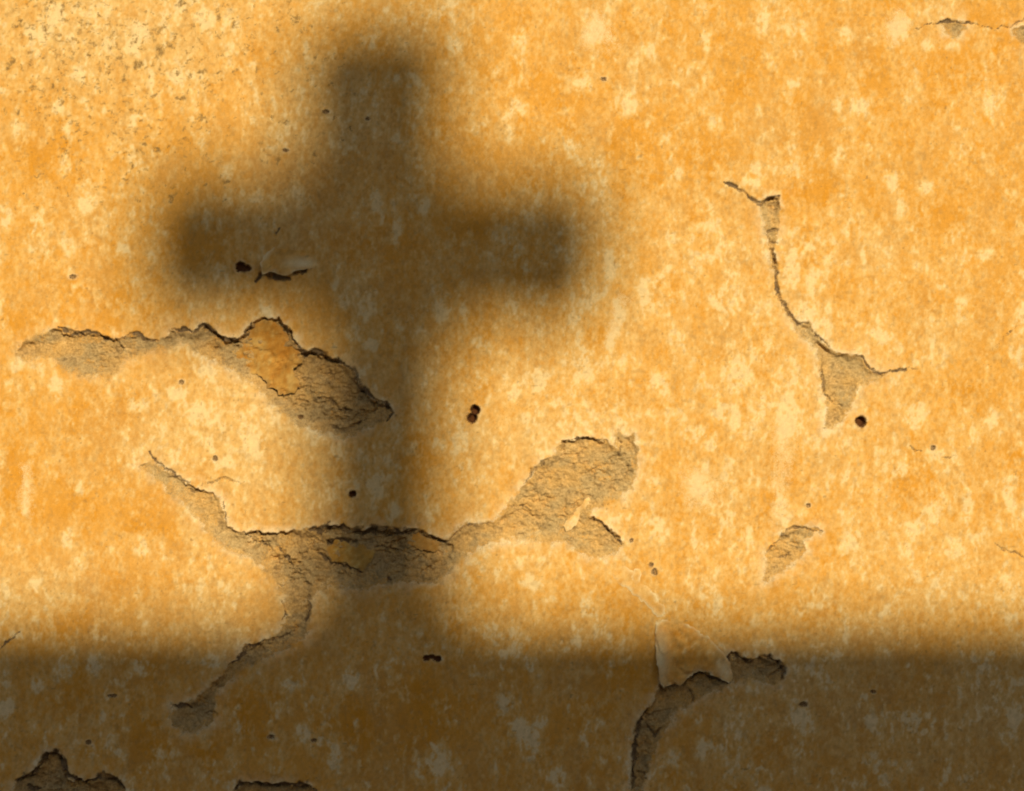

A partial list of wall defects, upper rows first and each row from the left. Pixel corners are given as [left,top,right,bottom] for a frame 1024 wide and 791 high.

flaking render [15,317,394,441]
flaking render [139,428,640,738]
flaking render [761,524,823,586]
flaking render [627,620,787,791]
flaking render [10,748,126,791]